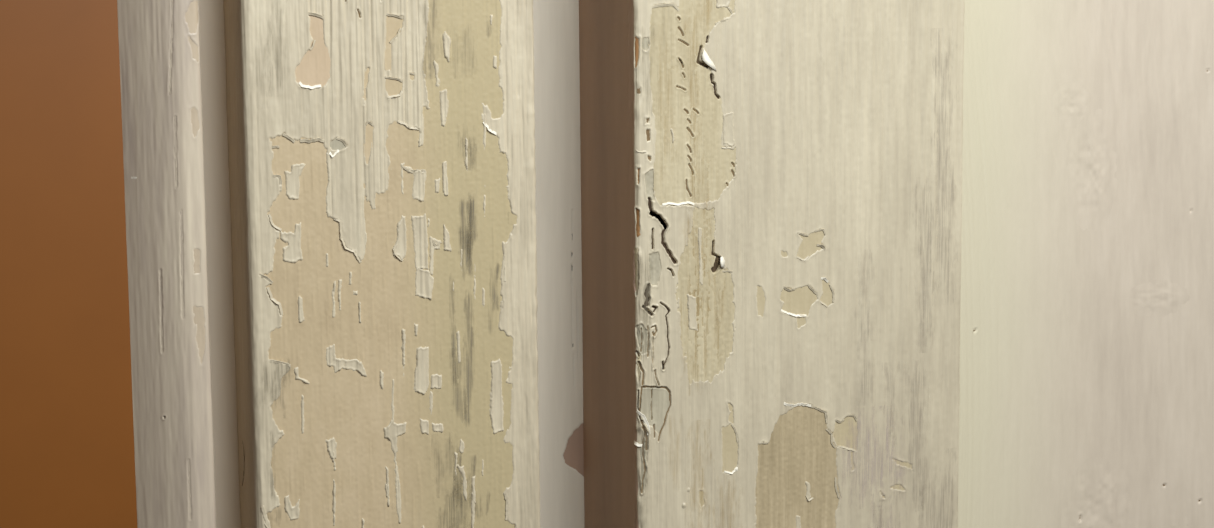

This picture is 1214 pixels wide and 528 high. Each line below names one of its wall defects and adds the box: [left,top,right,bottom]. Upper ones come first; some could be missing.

peeling [259,0,516,528]
peeling [634,0,736,384]
peeling [780,277,835,317]
peeling [796,229,826,261]
peeling [634,324,670,492]
peeling [722,424,738,474]
peeling [755,402,858,528]